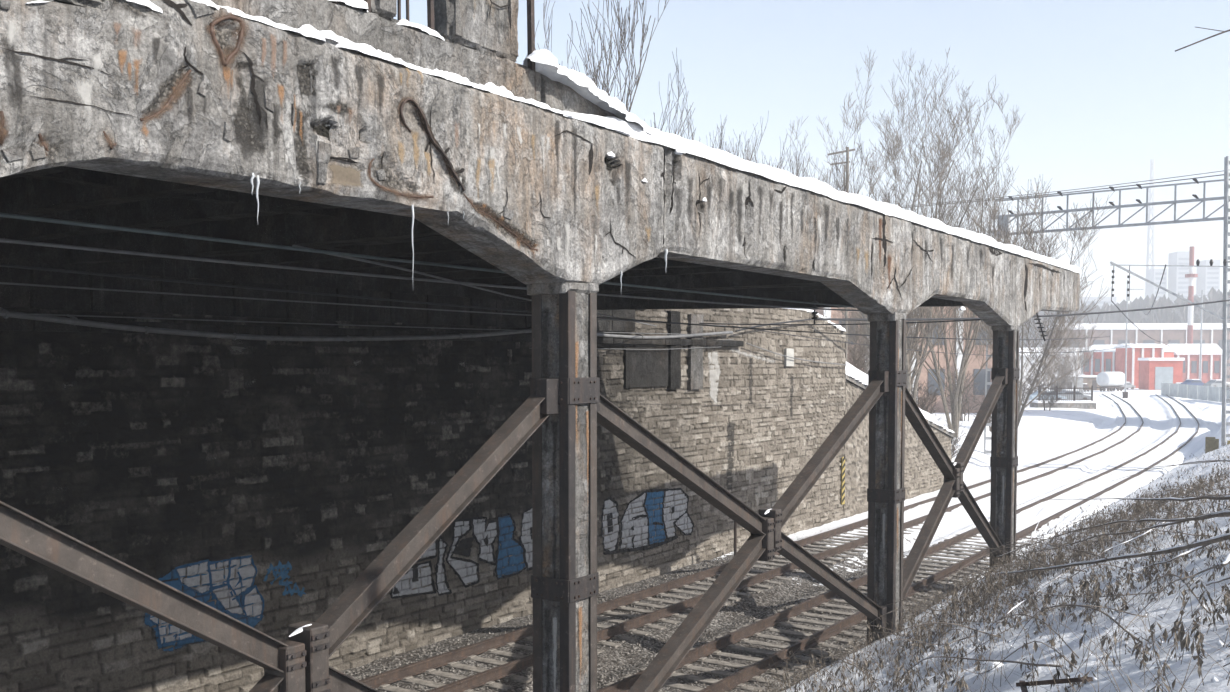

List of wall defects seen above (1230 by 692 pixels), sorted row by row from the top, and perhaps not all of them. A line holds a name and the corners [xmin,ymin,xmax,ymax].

spalling [114,0,143,16]
crack [1,47,113,76]
crack [28,95,141,119]
spalling [140,65,211,121]
water stain [237,79,279,159]
spalling [184,0,434,200]
spalling [398,98,538,251]
crack [871,214,934,299]